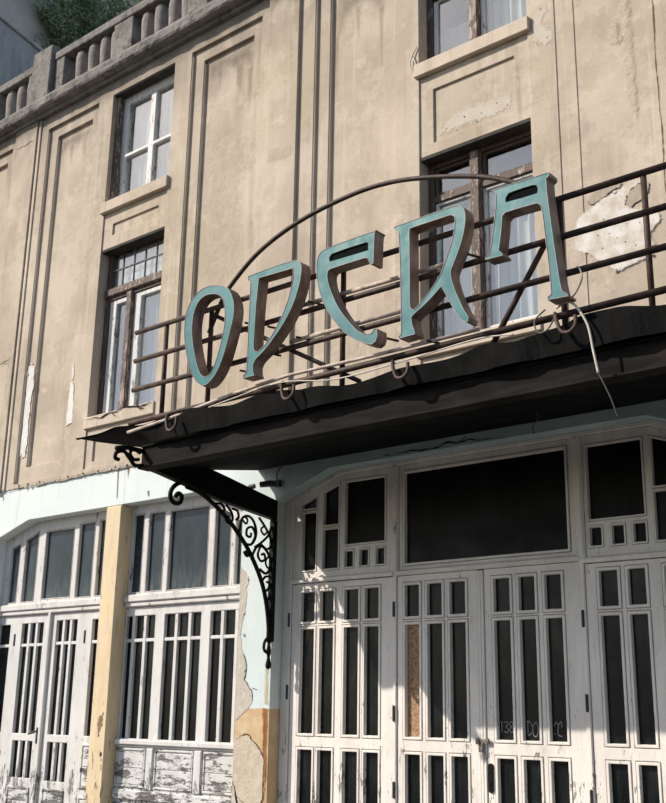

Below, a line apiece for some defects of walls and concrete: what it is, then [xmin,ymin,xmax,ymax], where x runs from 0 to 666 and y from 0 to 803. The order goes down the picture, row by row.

peeling [439,91,512,135]
peeling [573,179,661,272]
spalling [20,344,35,458]
spalling [66,364,74,426]
crack [385,436,495,456]
peeling [235,567,253,720]
peeling [231,733,265,803]